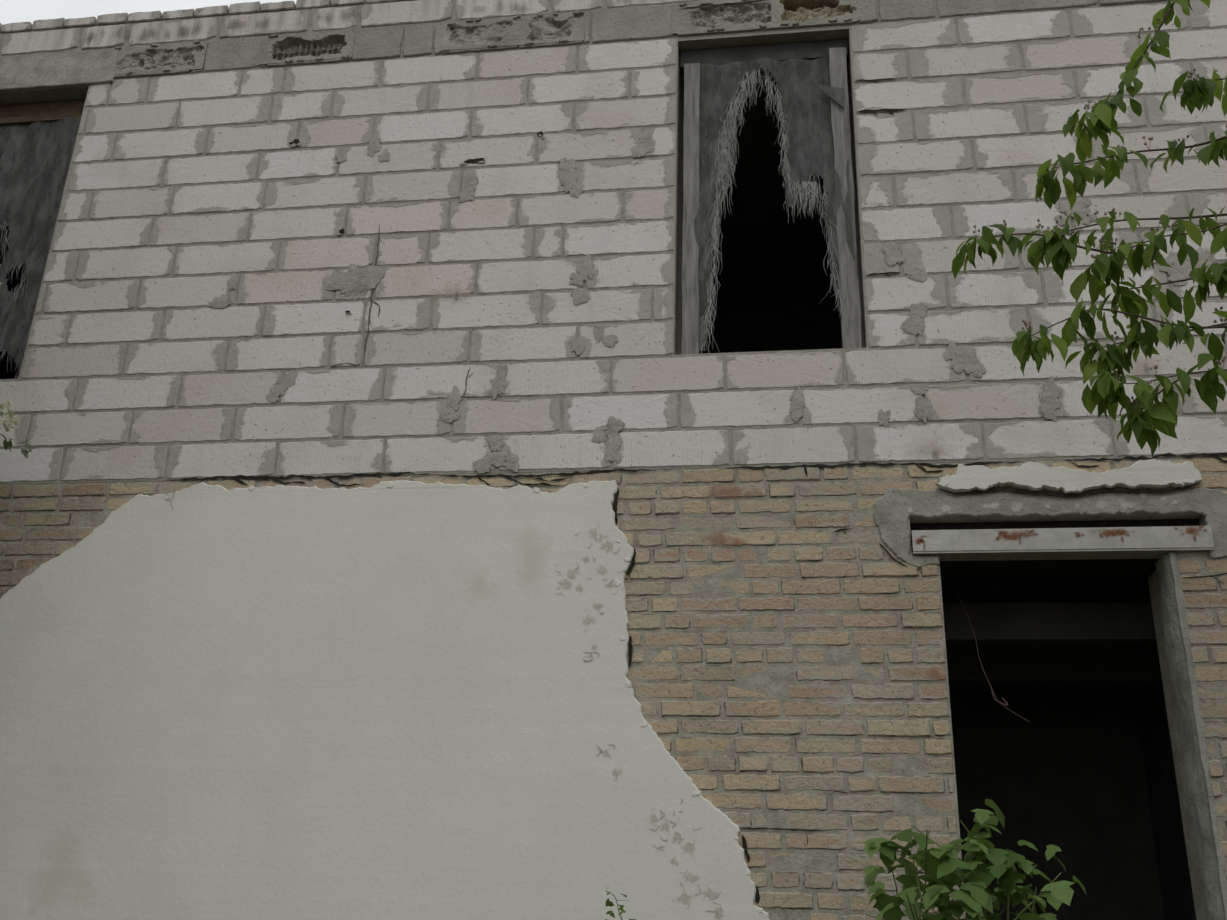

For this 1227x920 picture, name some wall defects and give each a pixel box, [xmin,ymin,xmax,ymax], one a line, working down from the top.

spalling [259,30,356,64]
spalling [440,10,585,52]
spalling [672,0,860,34]
corrosion [996,530,1038,540]